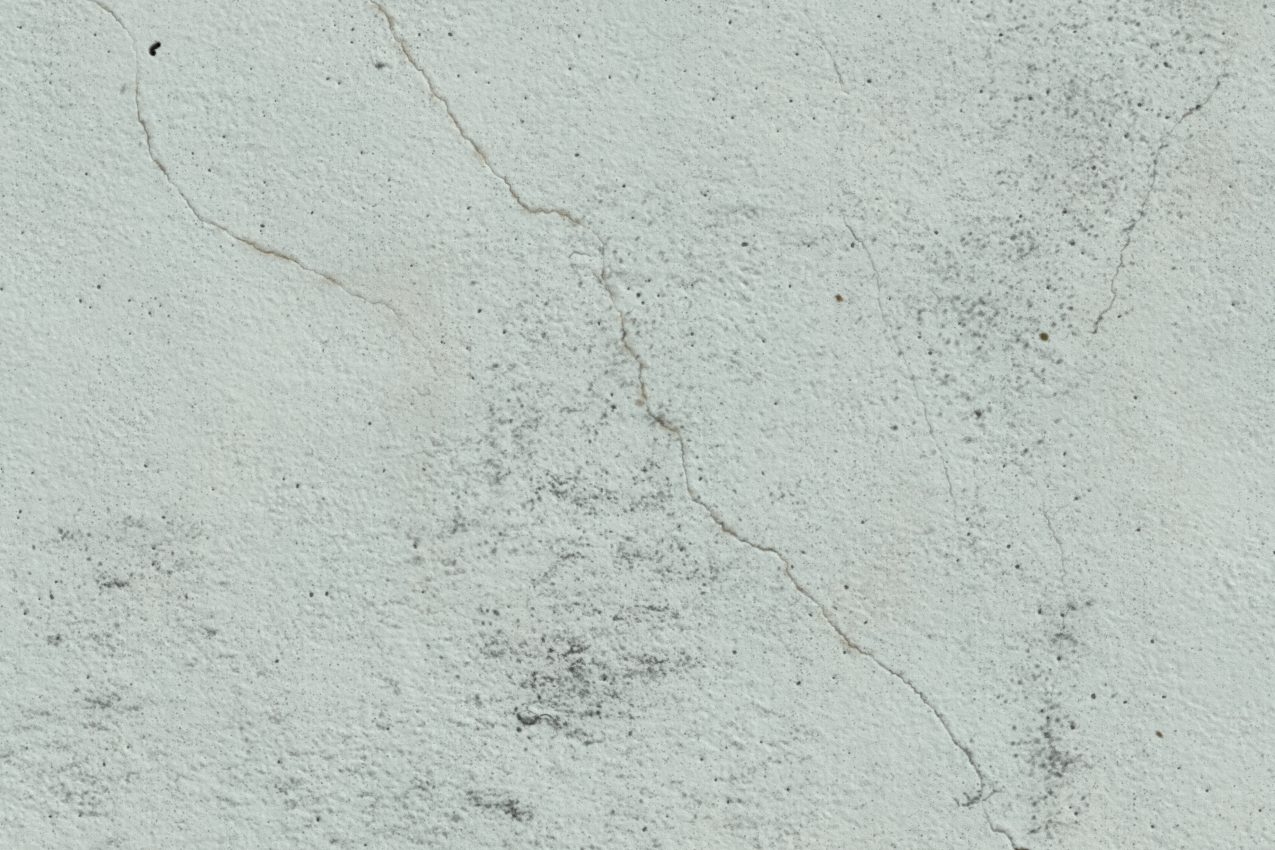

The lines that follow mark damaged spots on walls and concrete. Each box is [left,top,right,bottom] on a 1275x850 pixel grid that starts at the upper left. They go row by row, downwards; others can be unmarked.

crack [137,102,190,206]